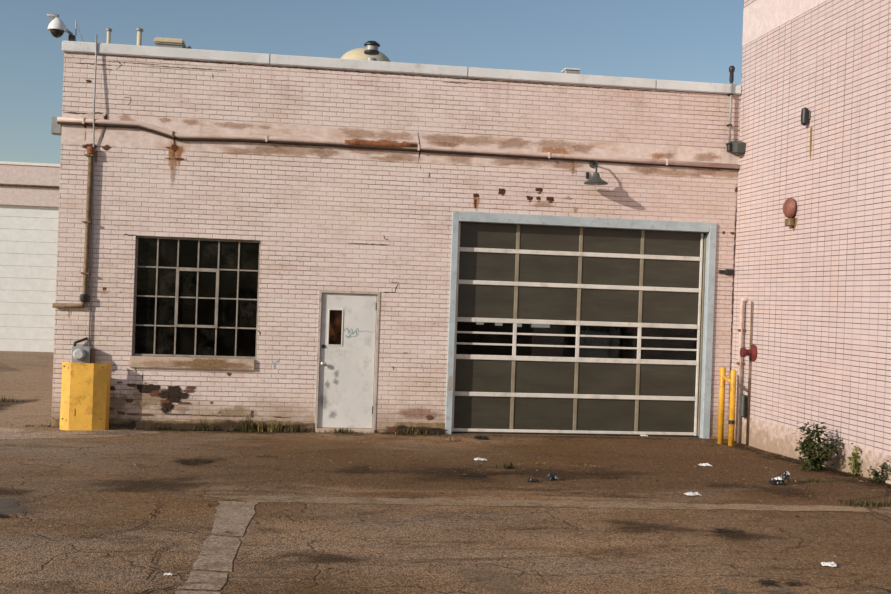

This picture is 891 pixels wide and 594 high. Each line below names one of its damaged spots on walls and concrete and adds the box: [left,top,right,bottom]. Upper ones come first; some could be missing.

corrosion [166,139,184,180]
corrosion [345,139,418,148]
spalling [526,188,554,206]
peeling [109,382,195,416]